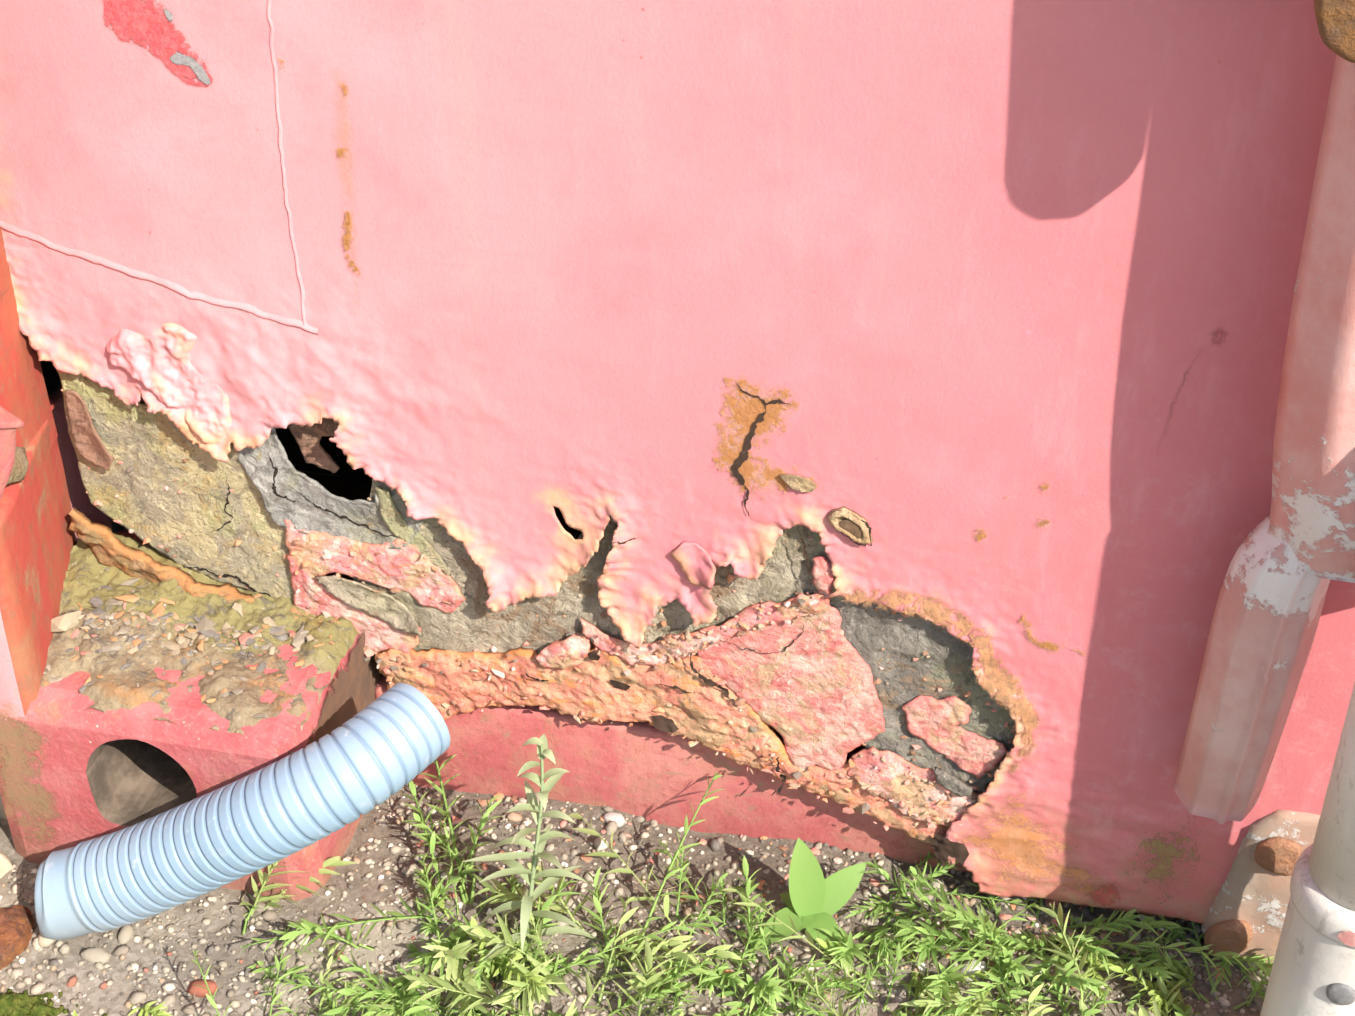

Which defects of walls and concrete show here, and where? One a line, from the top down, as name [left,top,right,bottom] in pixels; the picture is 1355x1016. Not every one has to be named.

rust [341,211,362,277]
crack [712,375,818,519]
rust [43,507,340,704]
spalling [53,364,1016,828]
crack [659,651,740,710]
crack [723,527,813,654]
rust [841,590,1039,772]
rust [1019,614,1085,656]
rust [308,631,1101,897]